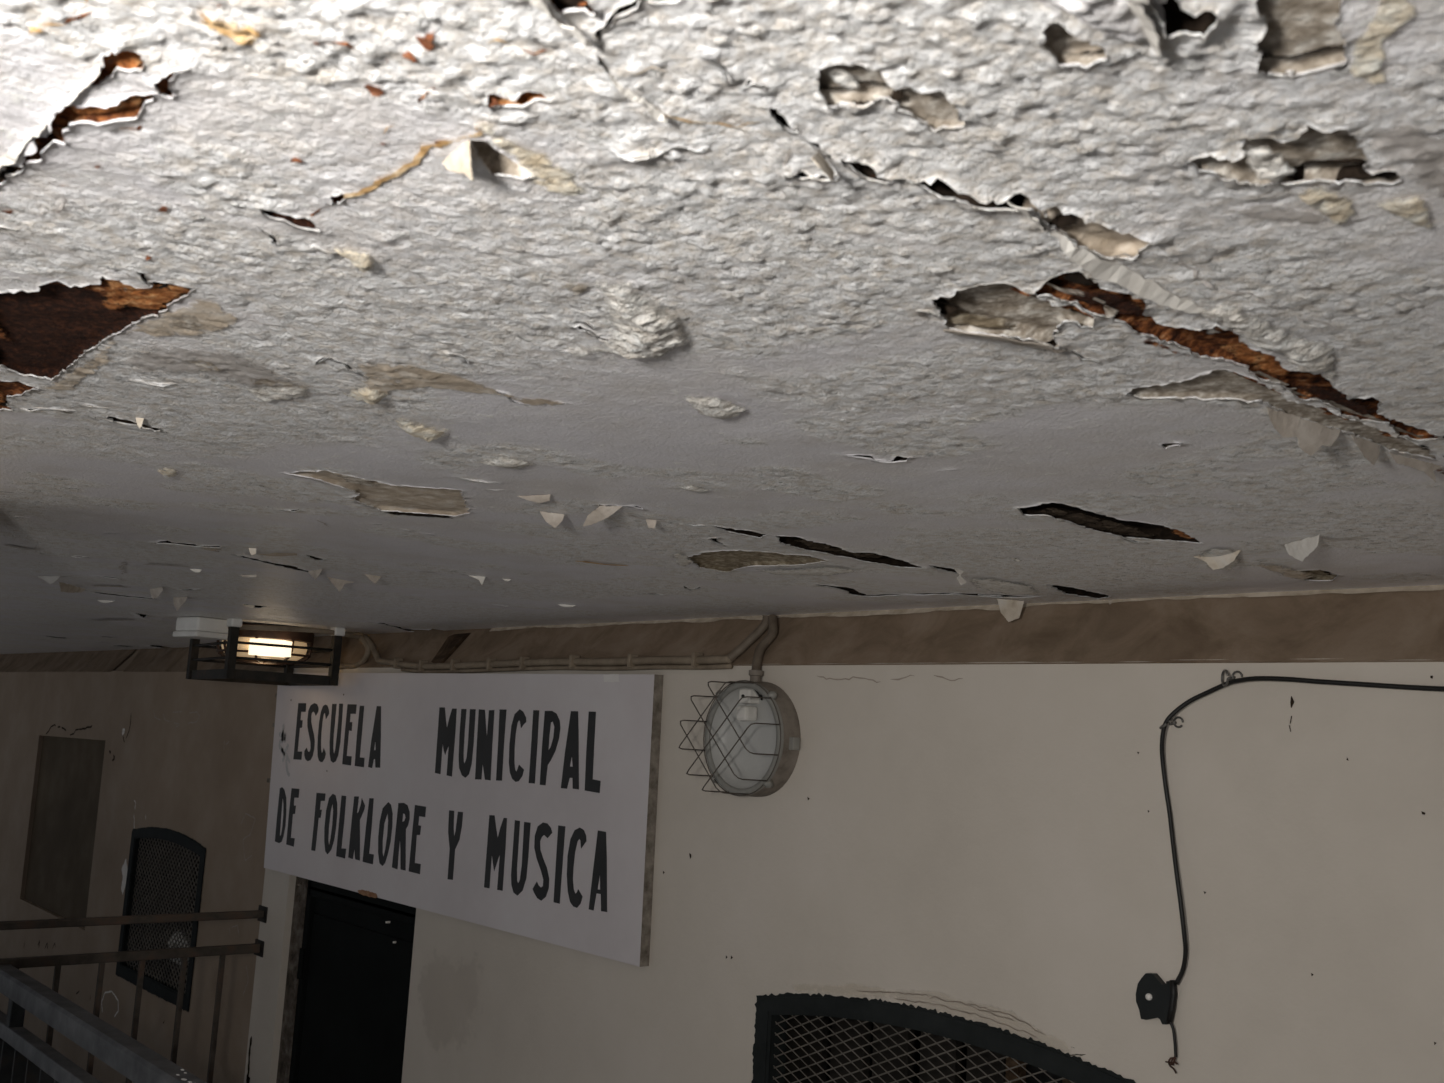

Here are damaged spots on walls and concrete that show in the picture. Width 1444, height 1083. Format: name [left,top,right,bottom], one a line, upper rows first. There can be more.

crack [488,38,549,55]
rust [528,0,675,47]
peeling [1044,23,1106,66]
peeling [1127,0,1218,58]
peeling [1256,0,1416,84]
peeling [442,123,585,196]
crack [596,29,1080,231]
peeling [818,64,965,129]
peeling [1190,125,1444,228]
peeling [934,197,1207,359]
rust [0,256,194,410]
peeling [1129,369,1444,482]